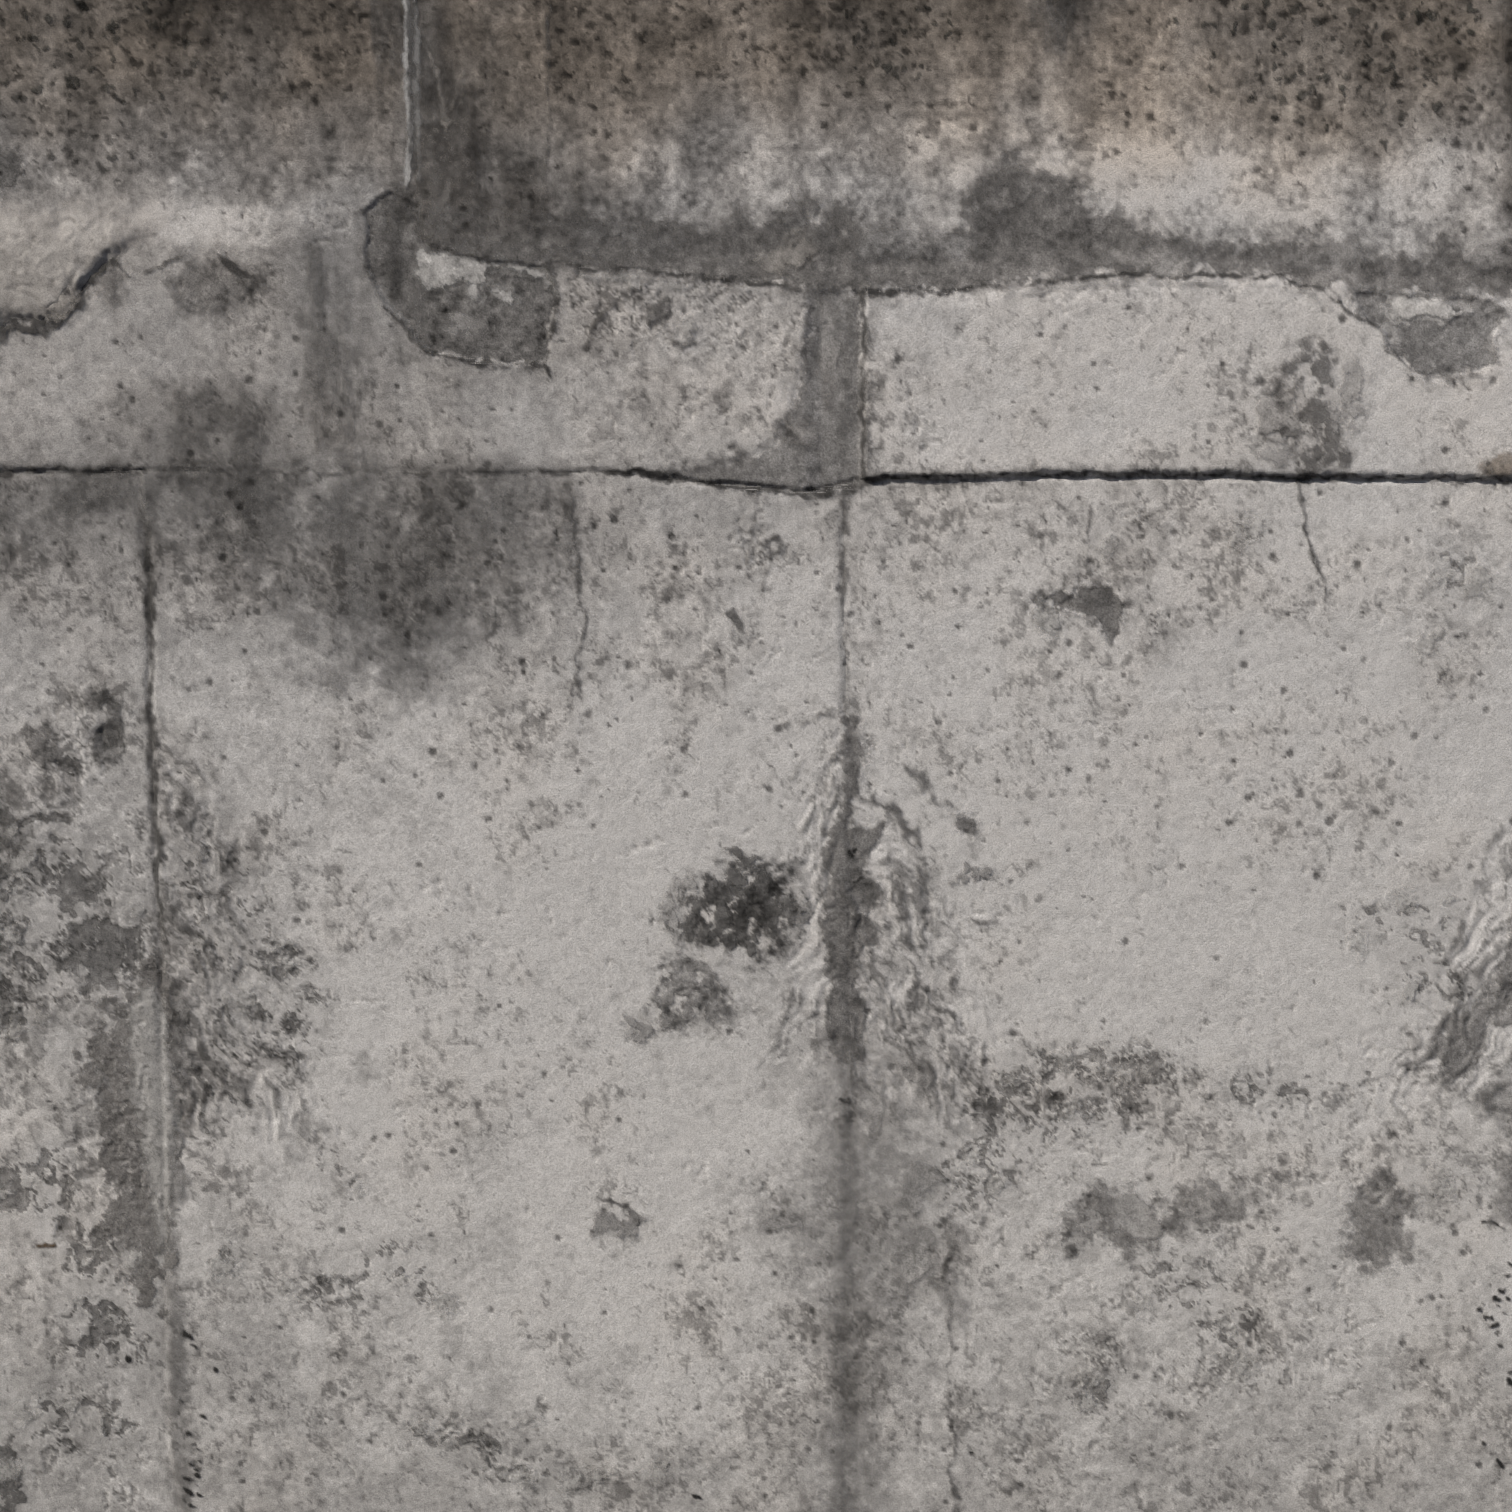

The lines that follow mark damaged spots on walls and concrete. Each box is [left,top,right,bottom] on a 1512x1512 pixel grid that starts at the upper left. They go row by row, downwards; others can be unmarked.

water stain [0,0,138,126]
water stain [370,0,547,238]
mould [840,5,952,84]
water stain [1201,0,1512,150]
spalling [360,149,1512,381]
crack [938,1221,966,1350]
crack [948,1471,960,1512]